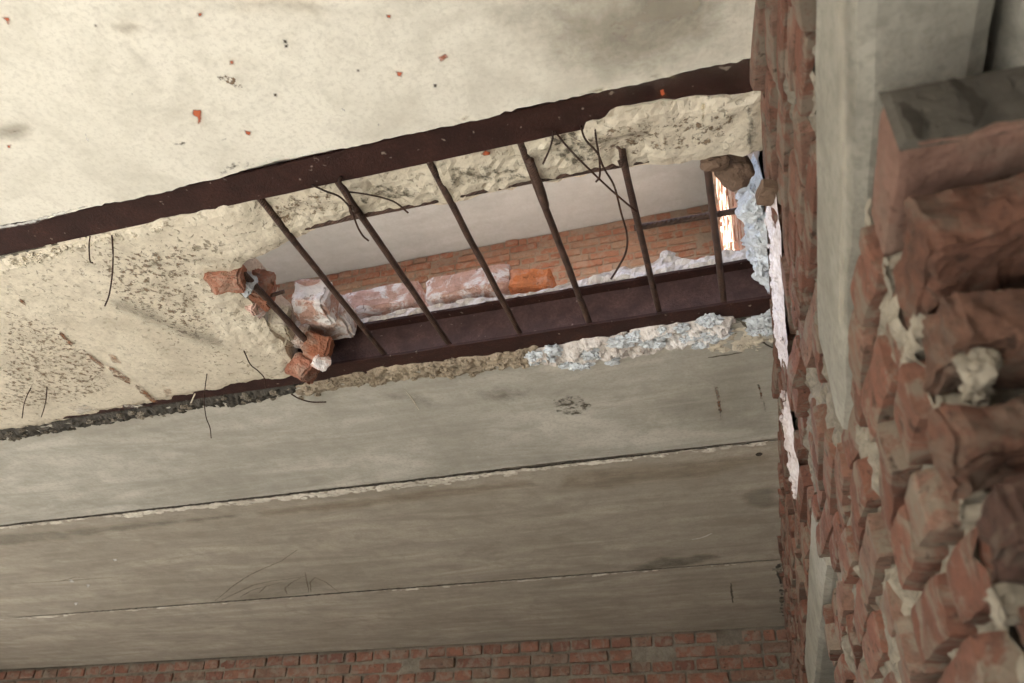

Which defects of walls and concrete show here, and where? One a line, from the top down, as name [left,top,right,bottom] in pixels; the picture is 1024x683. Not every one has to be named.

spalling [0,221,168,268]
rust [83,350,156,402]
spalling [0,265,538,442]
peeling [708,327,774,353]
crack [0,440,777,527]
crack [15,549,773,618]